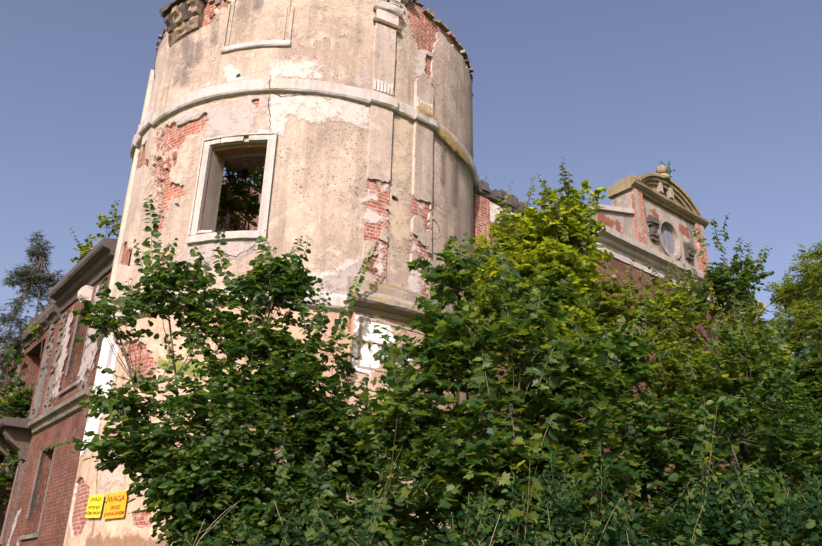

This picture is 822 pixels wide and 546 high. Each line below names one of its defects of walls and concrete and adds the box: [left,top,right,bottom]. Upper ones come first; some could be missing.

spalling [201,0,237,27]
spalling [405,0,437,76]
crack [268,76,305,130]
peeling [137,93,370,230]
spalling [310,116,443,296]
peeling [50,305,74,398]
peeling [77,285,158,489]
spalling [72,478,89,536]